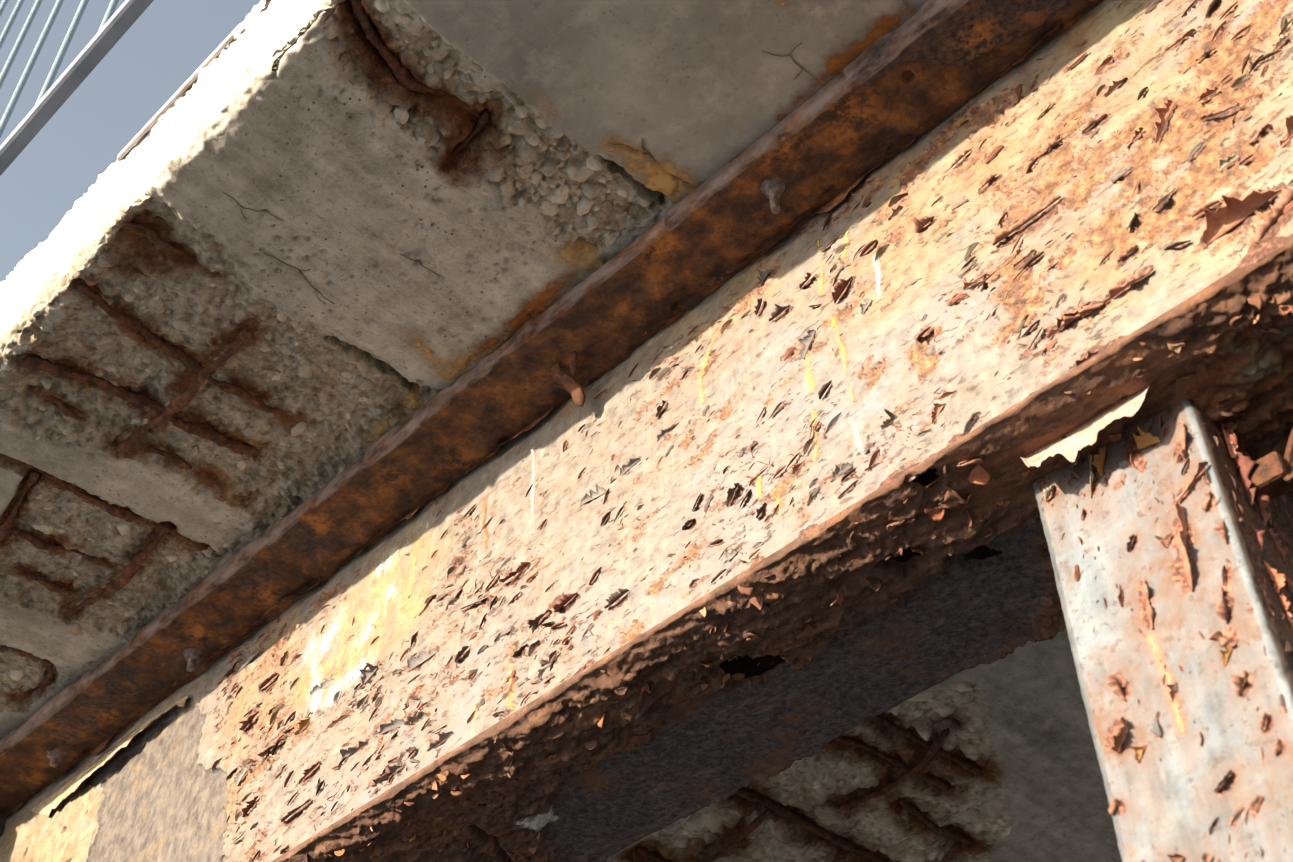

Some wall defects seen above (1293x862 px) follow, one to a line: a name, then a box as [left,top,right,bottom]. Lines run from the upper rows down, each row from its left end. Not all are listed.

crack [762,43,817,80]
spalling [322,0,668,257]
crack [223,192,283,221]
crack [264,253,335,304]
corrosion [1230,296,1293,335]
spalling [0,193,441,533]
corrosion [886,459,991,532]
corrosion [727,574,780,611]
spalling [538,381,1293,862]
spalling [0,644,60,714]
peeling [370,685,383,707]
corrosion [431,770,503,837]